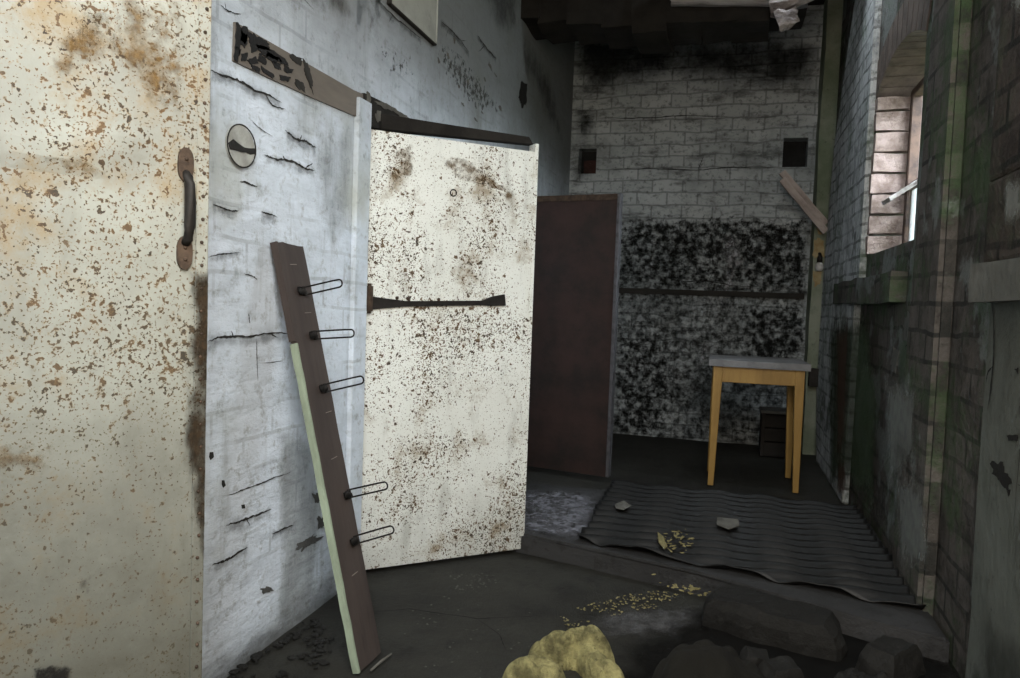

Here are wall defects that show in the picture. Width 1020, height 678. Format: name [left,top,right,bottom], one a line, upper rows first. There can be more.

corrosion [58,26,101,69]
corrosion [115,44,180,92]
crack [211,70,315,171]
corrosion [392,146,412,178]
corrosion [445,159,512,198]
crack [208,314,287,376]
crack [230,472,290,495]
flaking render [990,461,1012,496]
crack [213,509,293,565]